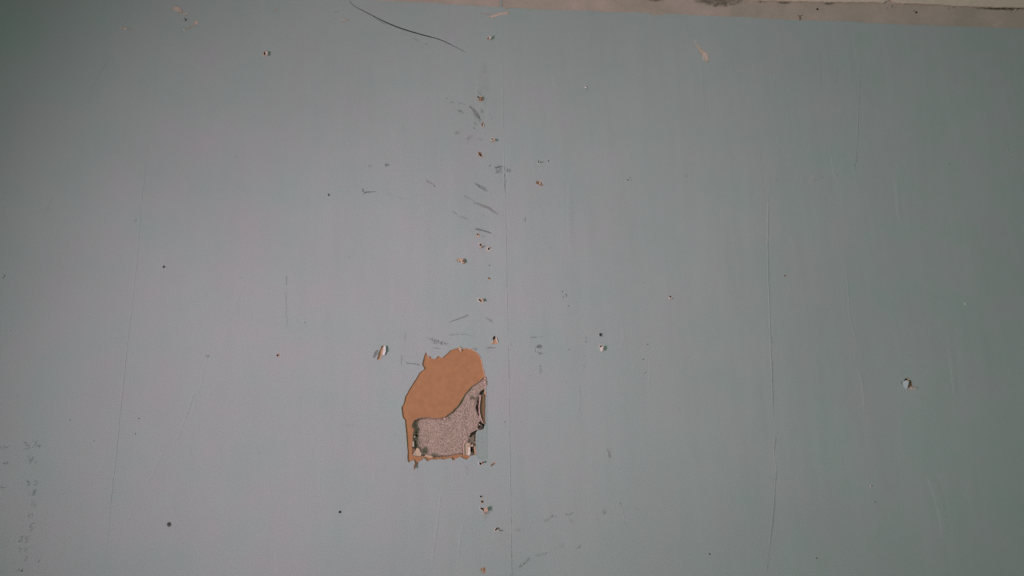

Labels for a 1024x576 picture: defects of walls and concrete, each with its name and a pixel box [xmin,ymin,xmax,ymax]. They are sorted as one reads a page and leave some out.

flaking render [401,347,488,469]